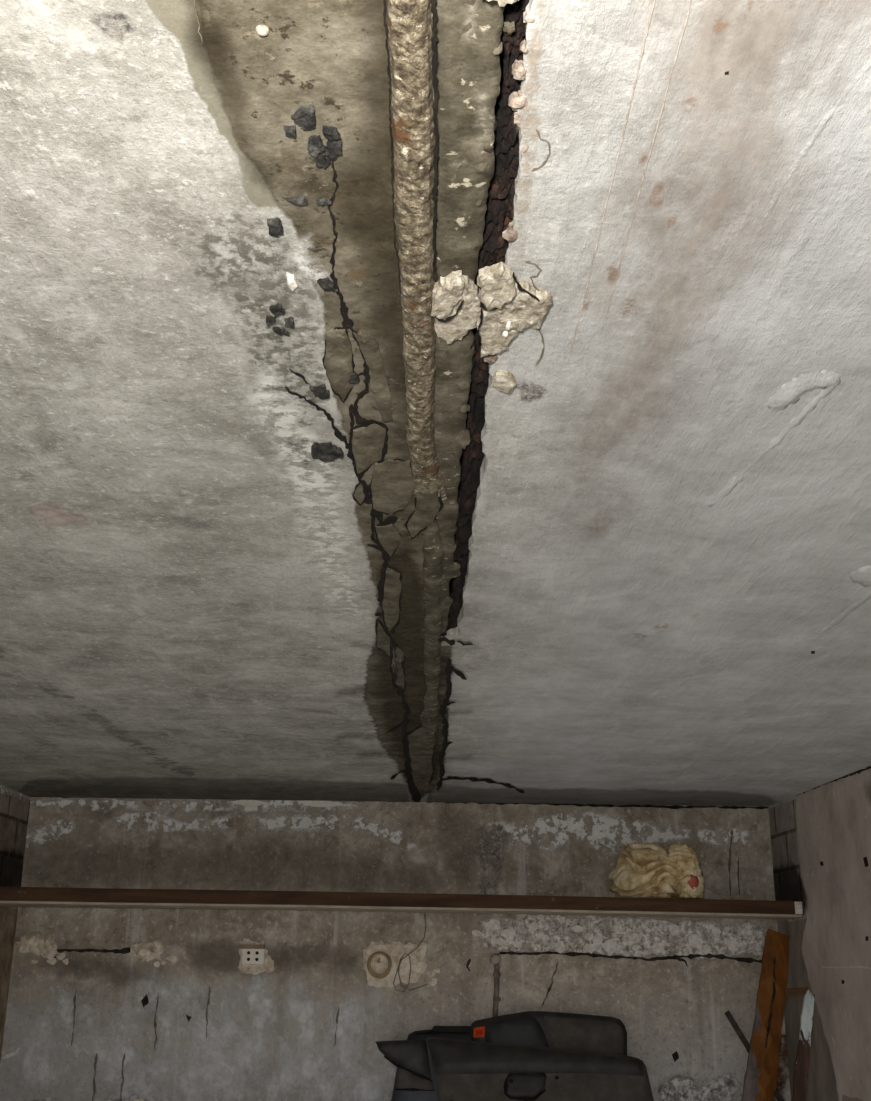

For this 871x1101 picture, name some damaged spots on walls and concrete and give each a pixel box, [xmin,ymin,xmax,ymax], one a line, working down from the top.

corrosion [514,1,525,40]
peeling [283,104,342,169]
crack [531,129,550,172]
peeling [267,218,283,237]
flaking render [431,262,552,358]
leakage [146,0,452,793]
spalling [309,328,444,691]
crack [285,145,769,896]
crack [798,766,871,795]
crack [54,947,131,959]
spalling [472,914,765,960]
crack [499,951,762,1007]